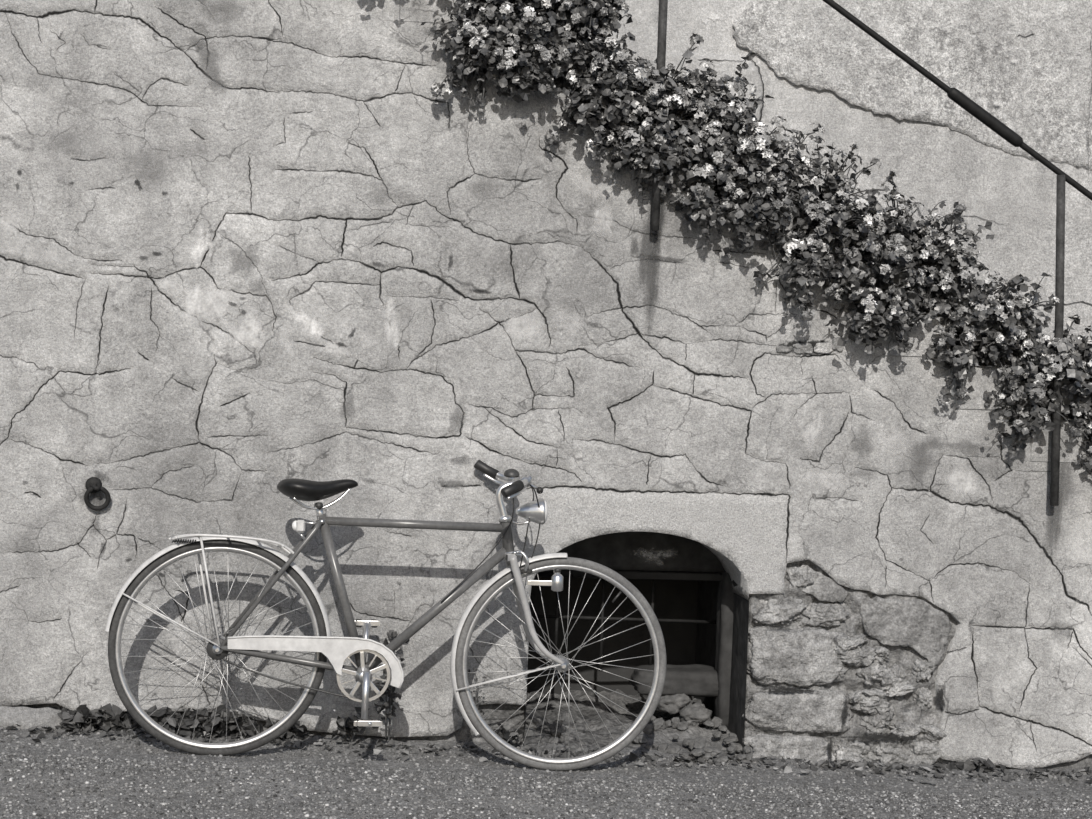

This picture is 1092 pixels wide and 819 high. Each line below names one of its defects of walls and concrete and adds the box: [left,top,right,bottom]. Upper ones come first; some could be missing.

crack [0,0,926,564]
crack [156,574,189,624]
crack [350,603,409,621]
crack [820,442,1092,751]